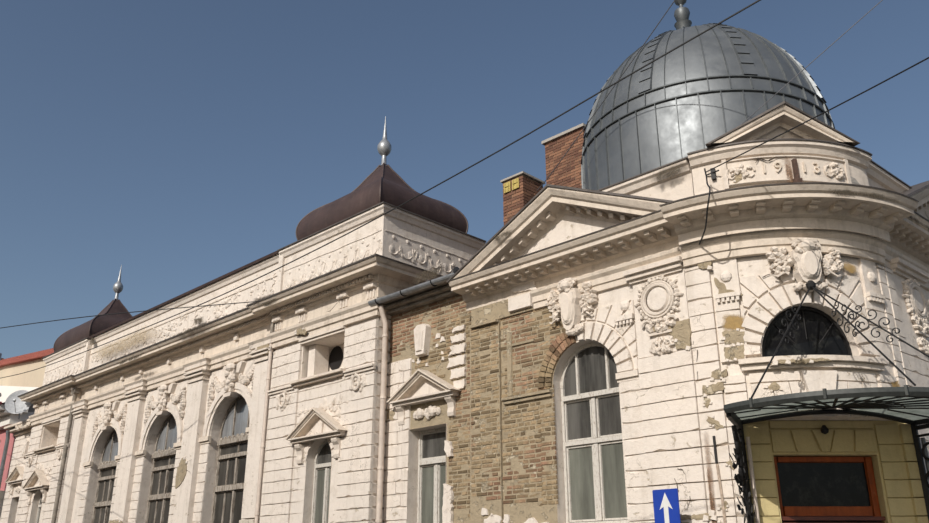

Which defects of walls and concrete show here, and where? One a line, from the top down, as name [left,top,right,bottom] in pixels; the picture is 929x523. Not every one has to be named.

spalling [511,281,538,293]
spalling [390,295,576,523]
spalling [702,328,745,430]